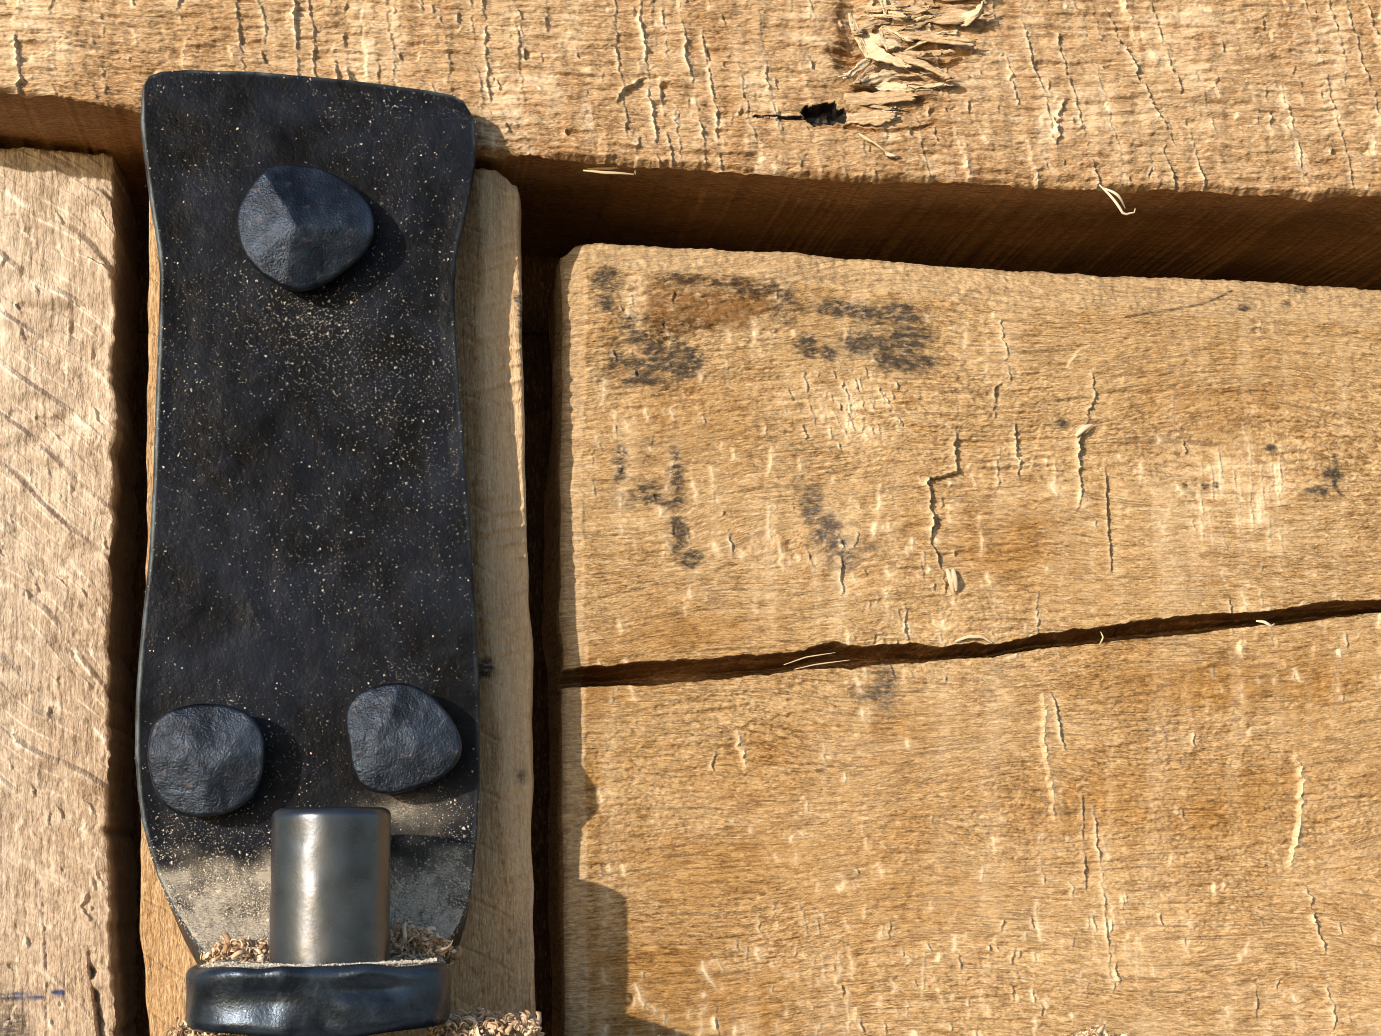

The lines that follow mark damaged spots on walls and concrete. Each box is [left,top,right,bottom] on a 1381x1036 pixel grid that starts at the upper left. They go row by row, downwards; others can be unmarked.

spalling [823,0,996,117]
damp [591,267,797,387]
damp [794,300,933,371]
crack [559,600,1381,690]